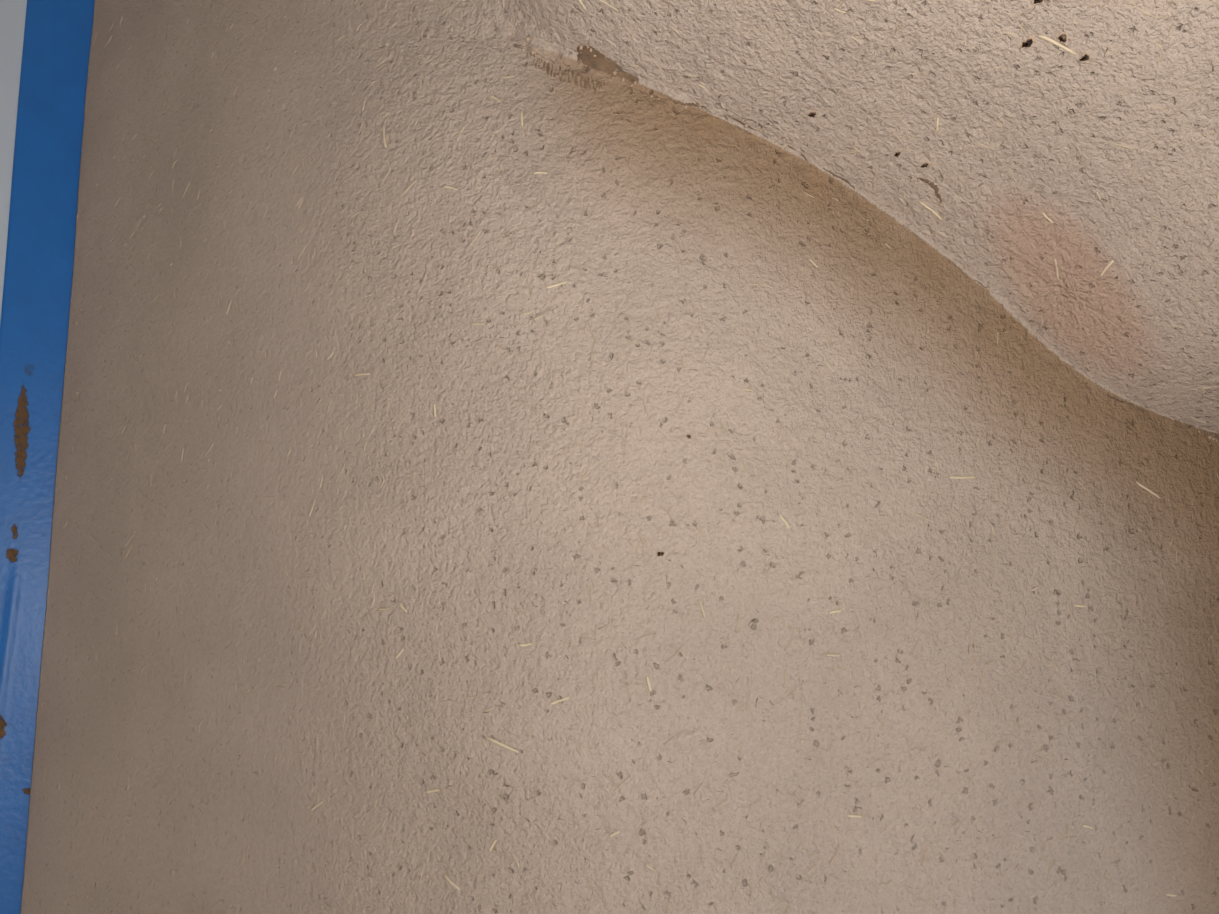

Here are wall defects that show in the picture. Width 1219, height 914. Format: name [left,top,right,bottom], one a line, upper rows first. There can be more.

spalling [527,47,639,92]